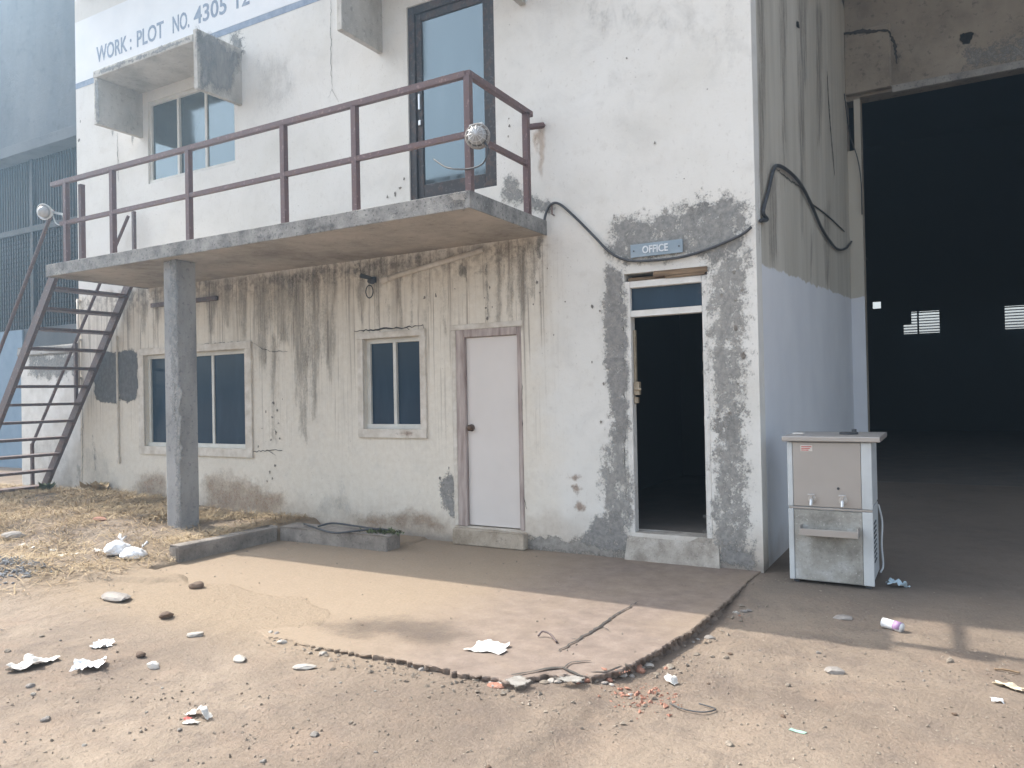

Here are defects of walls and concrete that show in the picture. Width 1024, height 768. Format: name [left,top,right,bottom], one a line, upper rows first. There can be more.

crack [355,324,424,332]
peeling [704,252,756,570]
spalling [439,467,455,516]